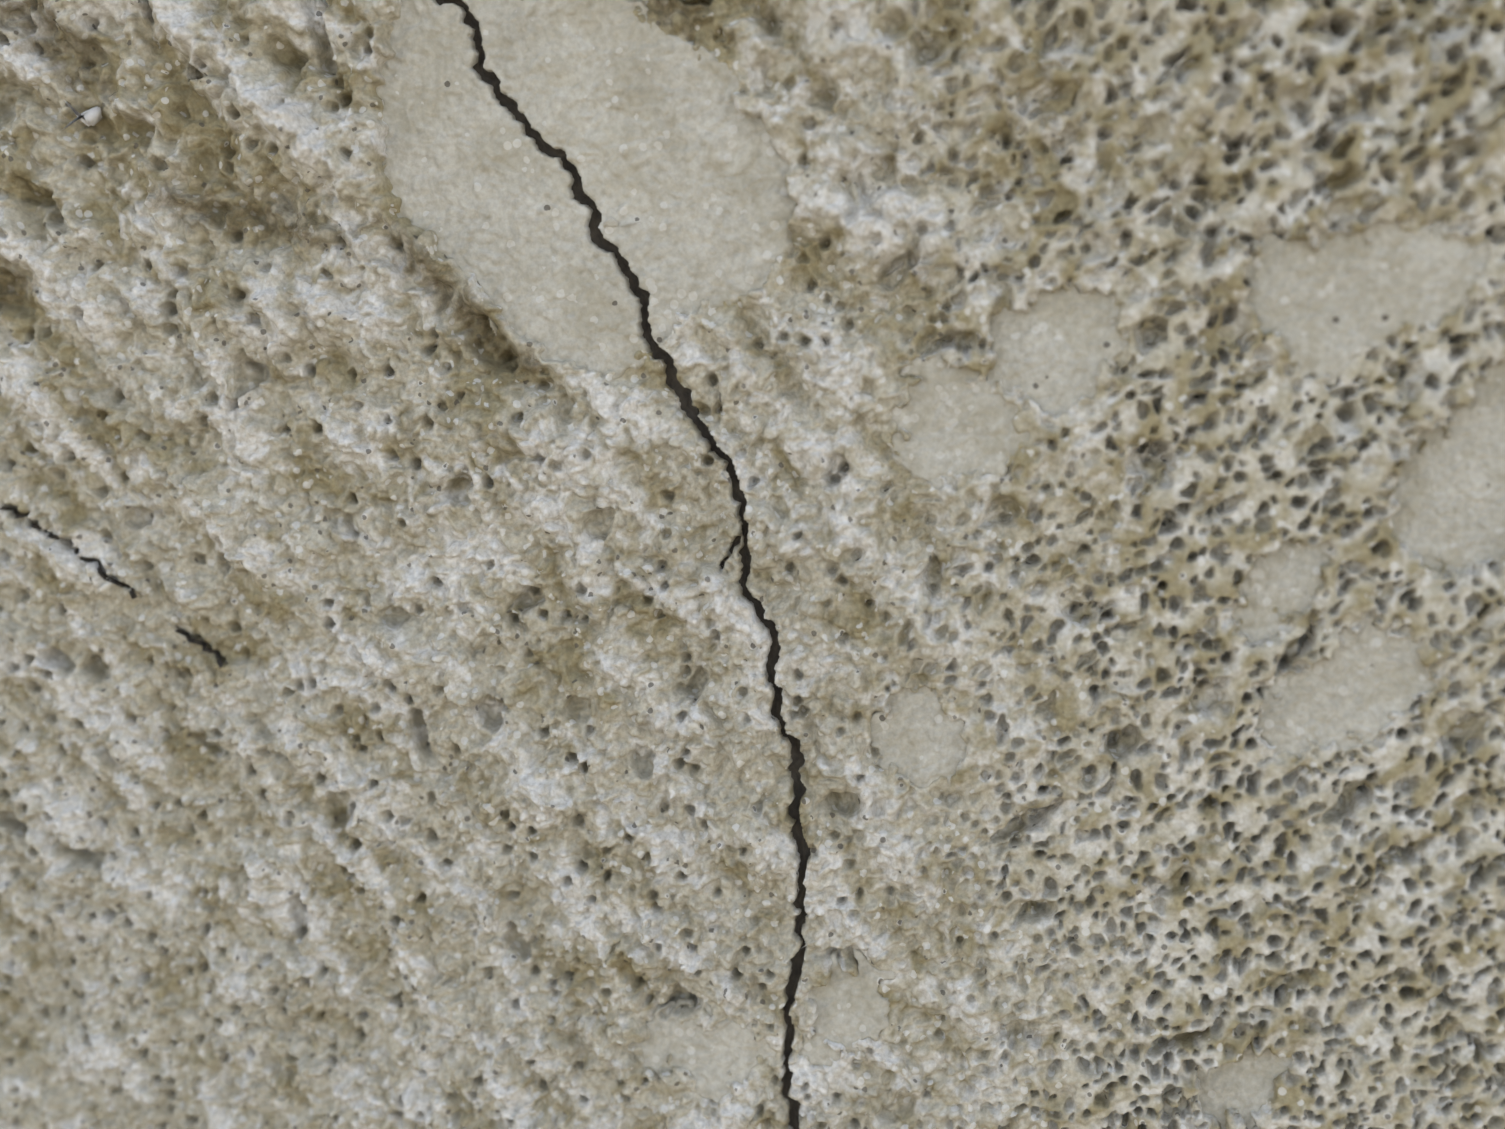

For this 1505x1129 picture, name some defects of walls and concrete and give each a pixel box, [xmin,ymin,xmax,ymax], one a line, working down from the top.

spalling [376,0,798,379]
crack [0,506,137,599]
crack [174,628,223,667]
crack [436,0,816,1129]
spalling [890,287,1128,490]
spalling [1242,221,1489,387]
spalling [1391,362,1505,573]